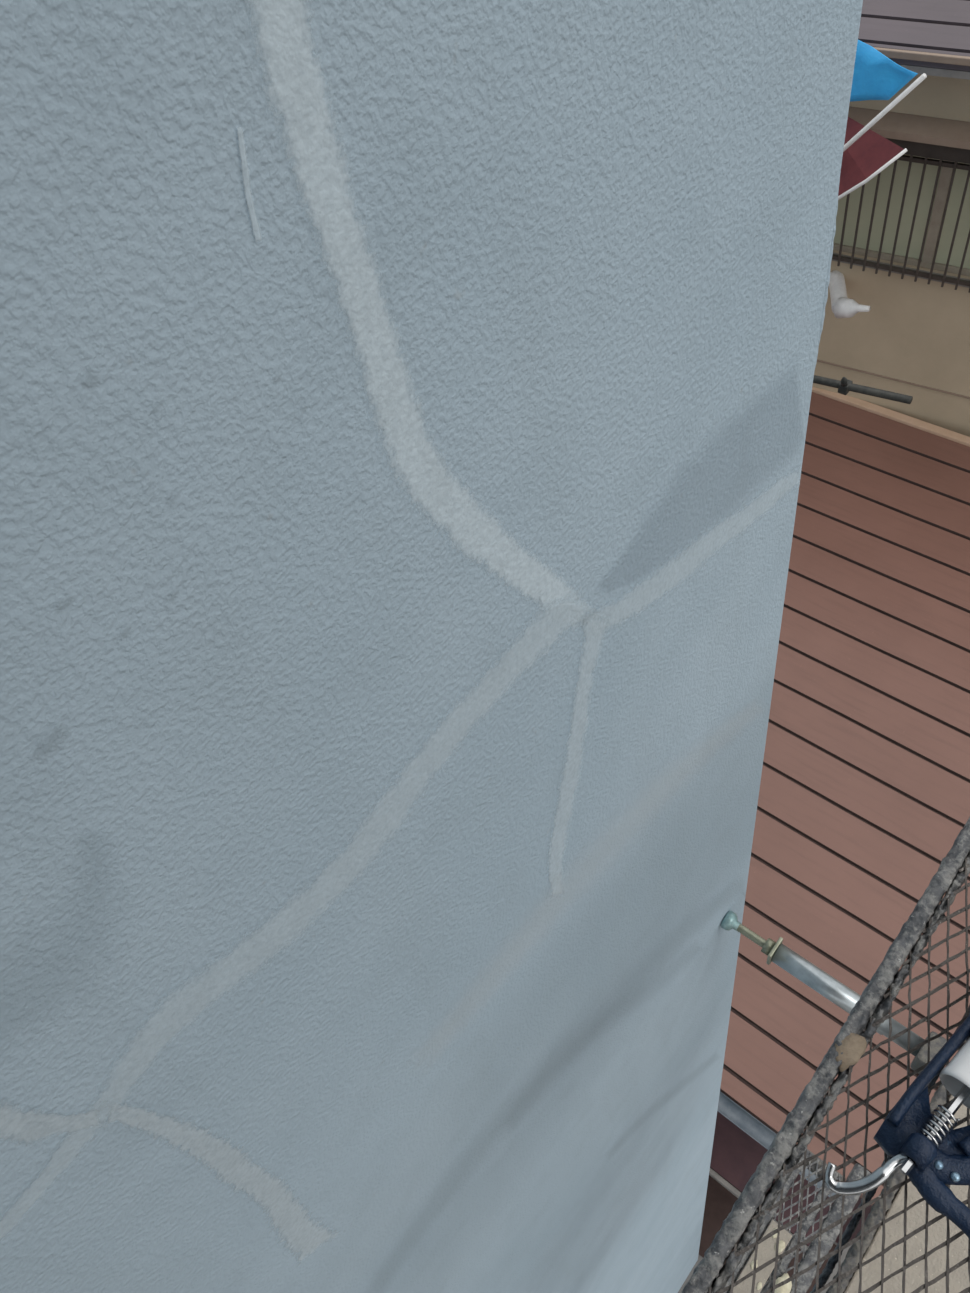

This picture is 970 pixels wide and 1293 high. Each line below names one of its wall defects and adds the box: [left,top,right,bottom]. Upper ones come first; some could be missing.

crack [0,0,799,1239]